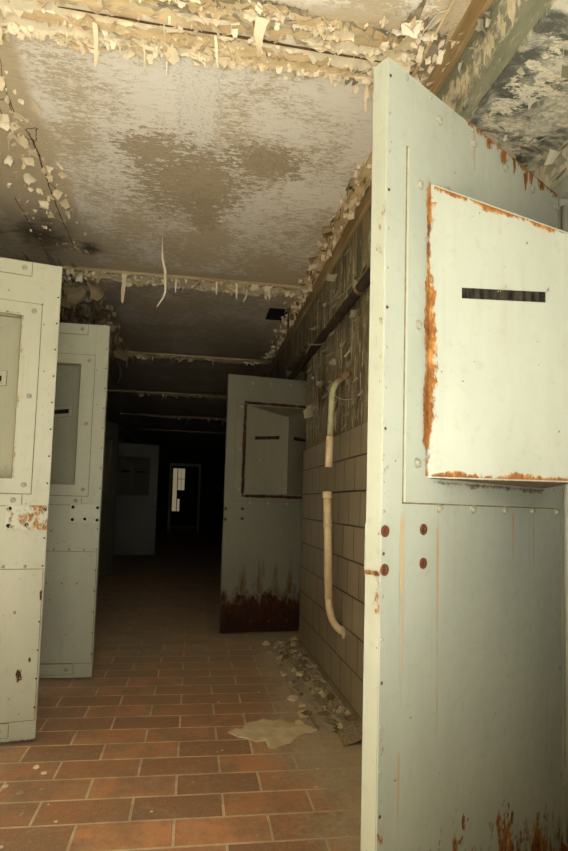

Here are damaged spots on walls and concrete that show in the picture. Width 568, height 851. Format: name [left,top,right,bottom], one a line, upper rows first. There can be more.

damp [102,117,317,235]
peeling [0,0,526,113]
corrosion [461,116,558,199]
peeling [476,32,568,189]
peeling [0,70,372,446]
corrosion [422,180,568,481]
corrosion [5,505,48,530]
corrosion [220,542,300,633]
corrosion [451,798,563,851]